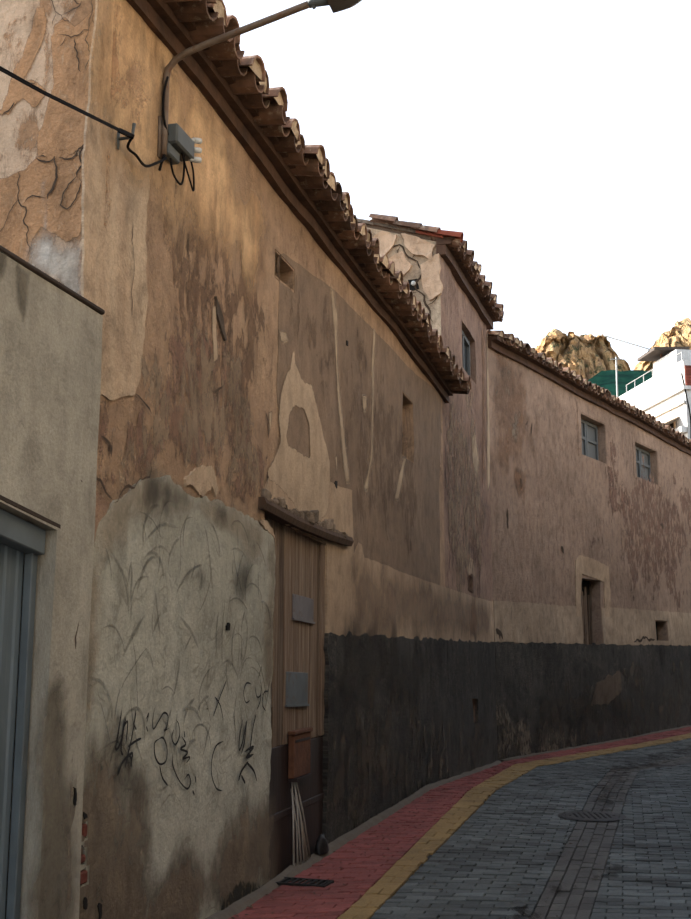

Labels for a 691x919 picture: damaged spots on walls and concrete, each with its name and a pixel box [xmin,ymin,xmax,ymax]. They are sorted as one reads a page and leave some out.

crack [51,0,95,72]
peeling [0,0,95,289]
crack [1,144,84,256]
water stain [17,266,28,316]
water stain [34,239,78,292]
peeling [372,231,443,301]
water stain [29,686,274,919]